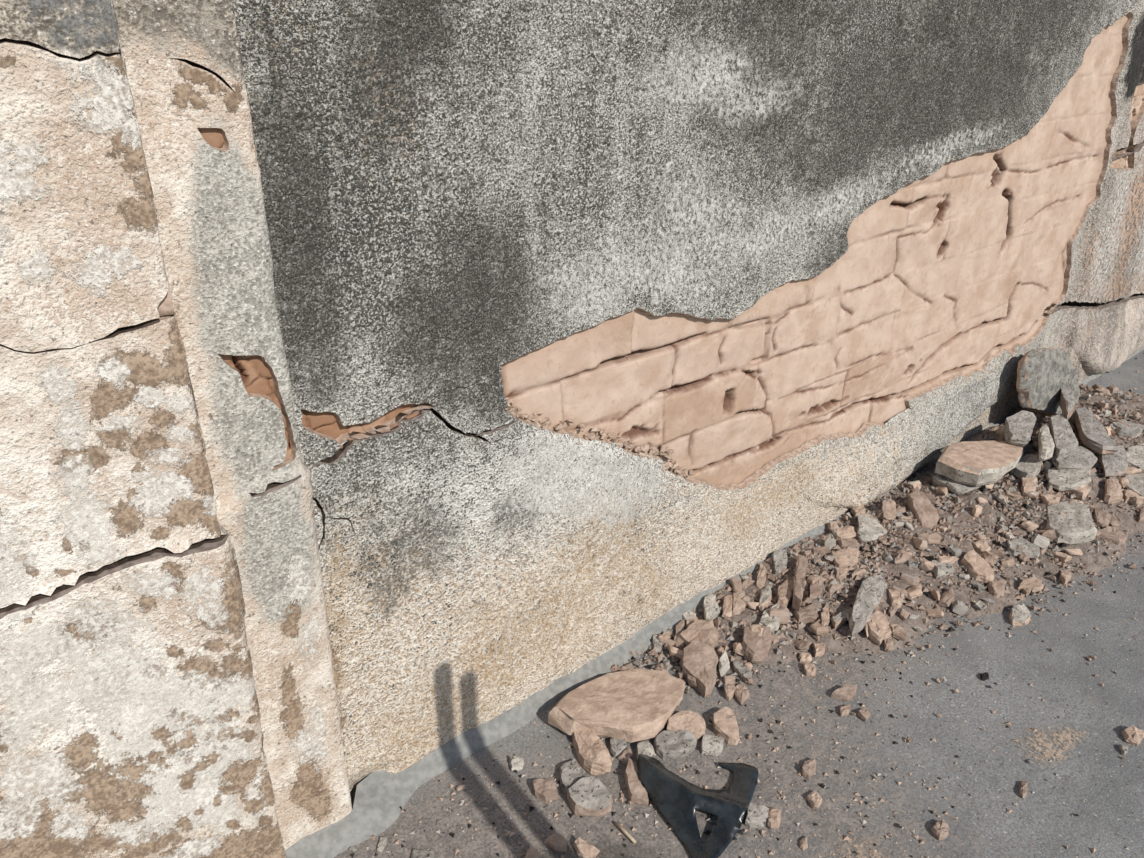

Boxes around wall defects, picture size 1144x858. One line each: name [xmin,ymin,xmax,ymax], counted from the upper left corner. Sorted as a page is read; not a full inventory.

crack [0,38,121,61]
damp [1124,15,1144,100]
crack [0,318,160,354]
peeling [63,57,160,232]
damp [260,112,337,401]
damp [398,0,1103,408]
flaking render [502,12,1144,491]
crack [1045,292,1144,315]
damp [1085,174,1129,315]
flaking render [218,354,435,470]
crack [0,534,229,619]
peeling [0,277,348,858]